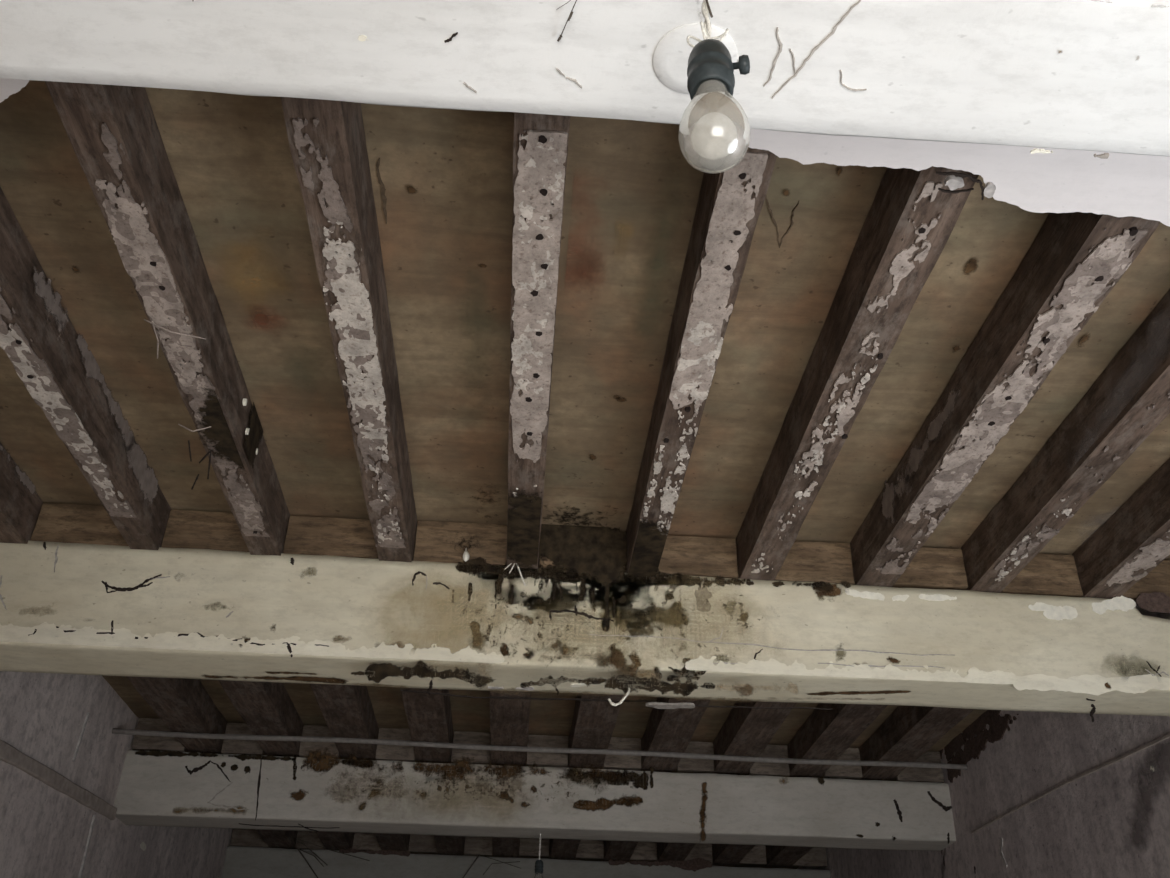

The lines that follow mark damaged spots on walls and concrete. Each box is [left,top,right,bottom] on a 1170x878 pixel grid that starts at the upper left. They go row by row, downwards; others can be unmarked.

crack [763,0,861,99]
crack [840,70,867,91]
peeling [0,287,137,518]
peeling [95,123,270,537]
peeling [292,118,406,548]
peeling [510,130,567,463]
spalling [640,126,1170,581]
peeling [0,622,505,664]
damp [135,748,654,803]
damp [438,490,771,702]
peeling [685,656,1170,696]
peeling [1092,529,1170,615]